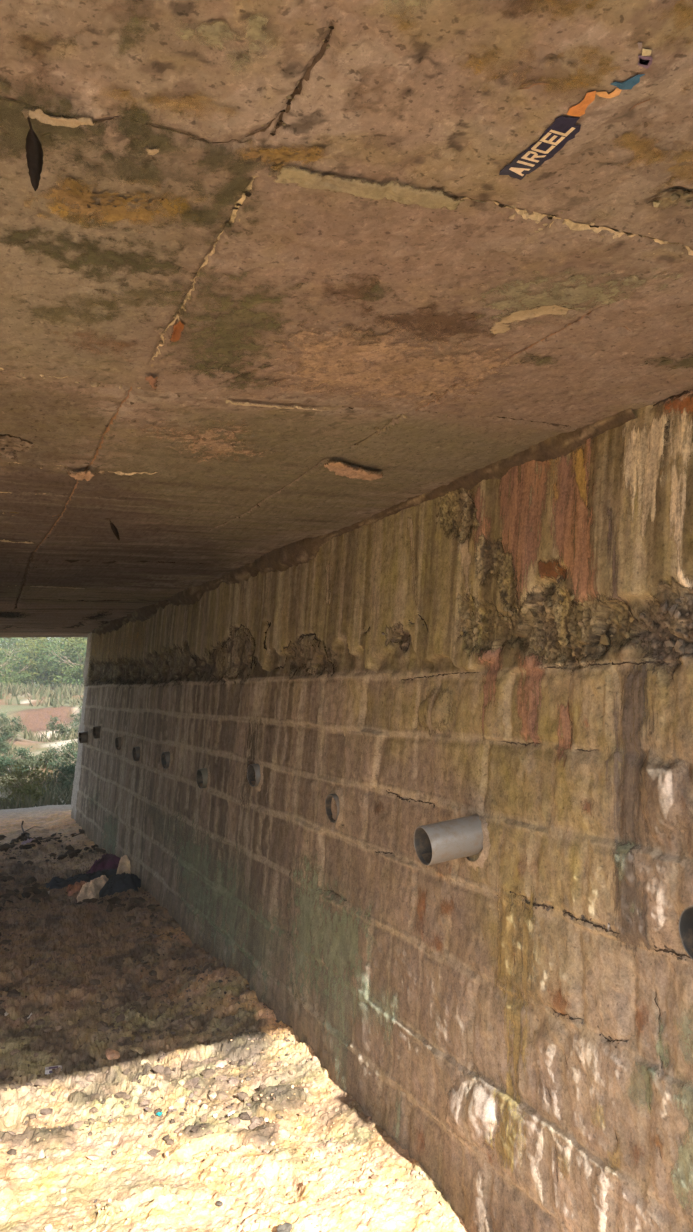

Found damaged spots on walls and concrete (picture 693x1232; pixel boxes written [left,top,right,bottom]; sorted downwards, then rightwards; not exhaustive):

crack [62,26,334,144]
crack [0,175,271,629]
spalling [324,462,383,481]
rust [468,438,599,604]
leakage [607,509,625,603]
leakage [622,408,693,589]
crack [510,891,619,934]